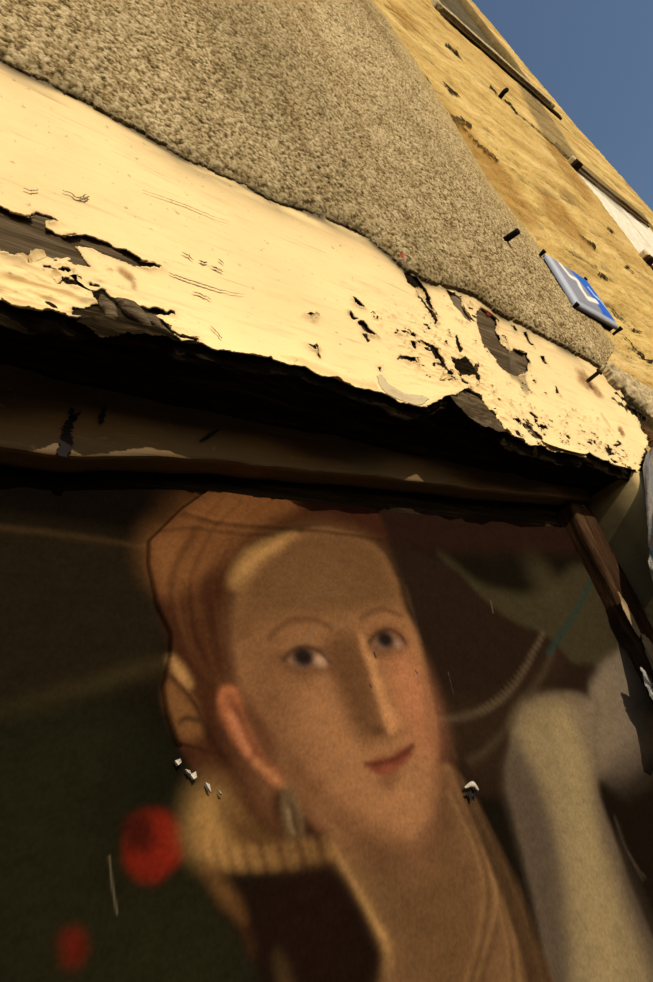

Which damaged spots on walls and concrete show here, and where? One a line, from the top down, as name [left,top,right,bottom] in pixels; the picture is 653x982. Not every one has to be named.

peeling [0,209,204,346]
peeling [350,301,377,342]
peeling [404,273,437,324]
peeling [448,290,532,376]
peeling [377,368,429,405]
peeling [397,339,621,455]